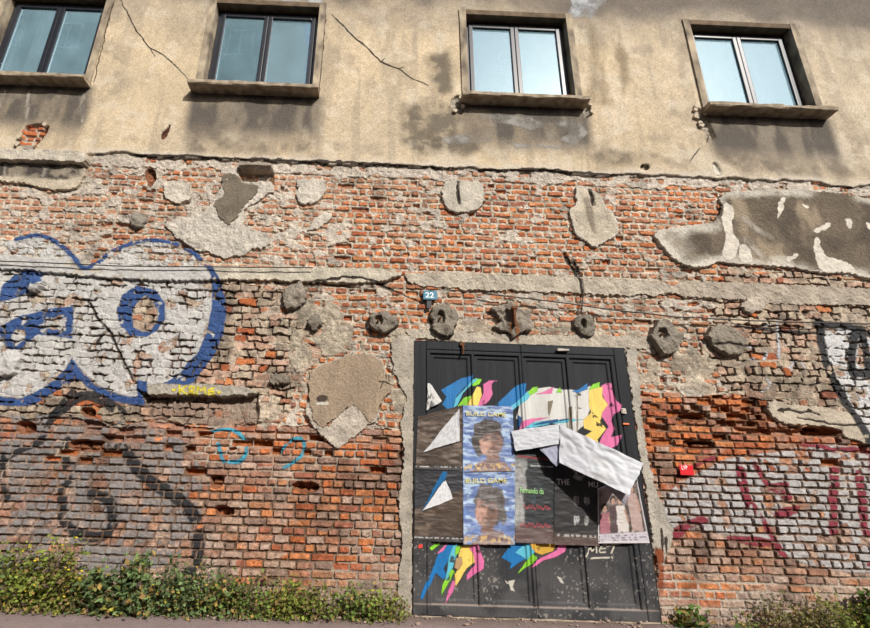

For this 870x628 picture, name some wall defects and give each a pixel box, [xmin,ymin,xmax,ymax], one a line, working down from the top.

water stain [571,0,606,17]
crack [93,0,188,83]
crack [319,14,428,89]
spalling [13,122,49,150]
crack [310,276,422,303]
crack [563,254,583,298]
peeling [721,202,753,264]
peeling [767,253,799,270]
peeling [813,222,857,278]
crack [777,408,870,426]